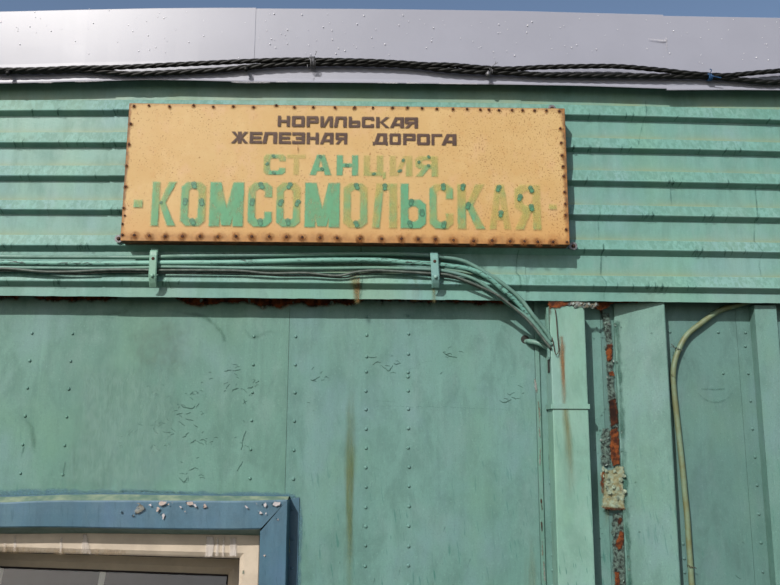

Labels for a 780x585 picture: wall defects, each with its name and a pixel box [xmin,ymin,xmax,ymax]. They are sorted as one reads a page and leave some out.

corrosion [594,301,638,318]
corrosion [609,398,620,466]
peeling [120,501,169,519]
corrosion [615,518,624,549]